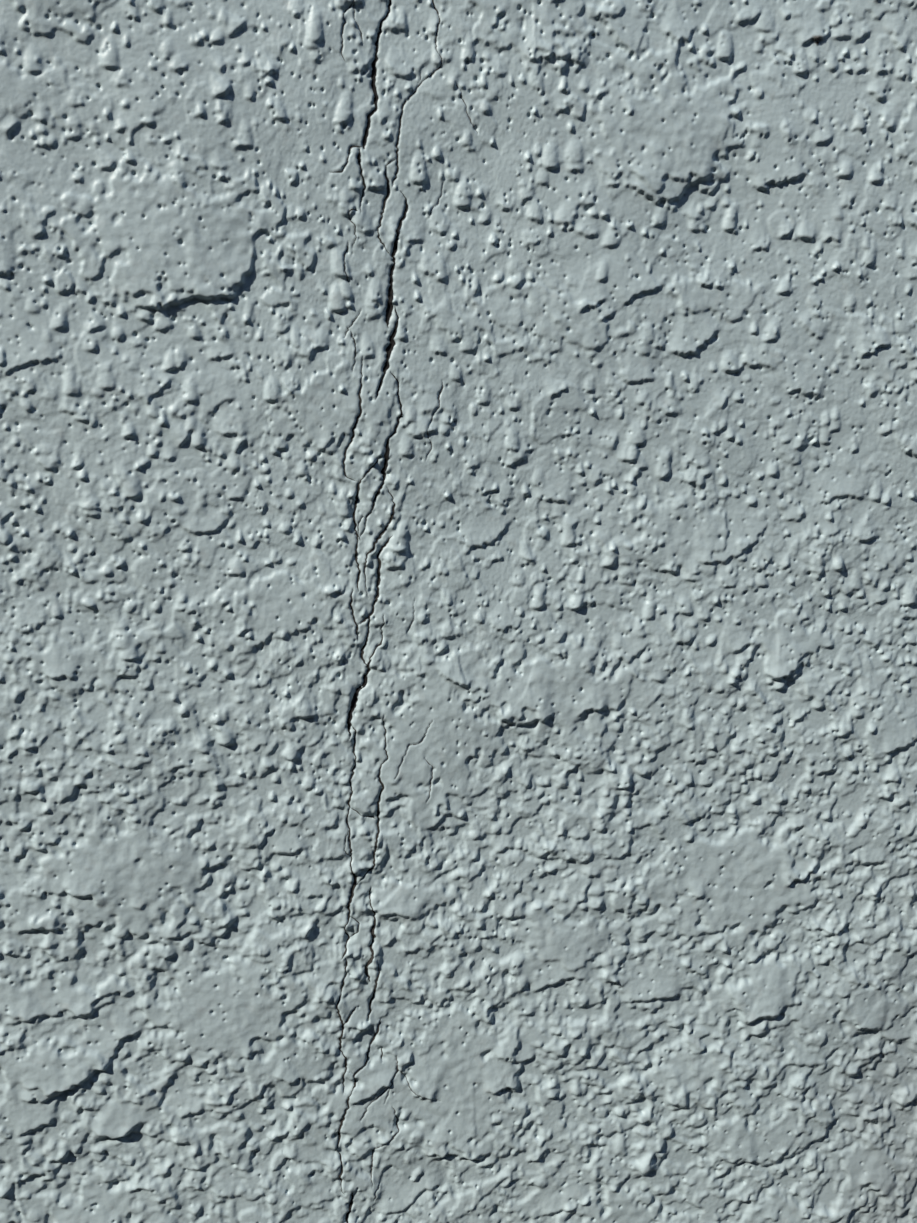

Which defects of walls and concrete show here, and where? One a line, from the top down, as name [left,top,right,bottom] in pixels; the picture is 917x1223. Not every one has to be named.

crack [335,0,477,1223]